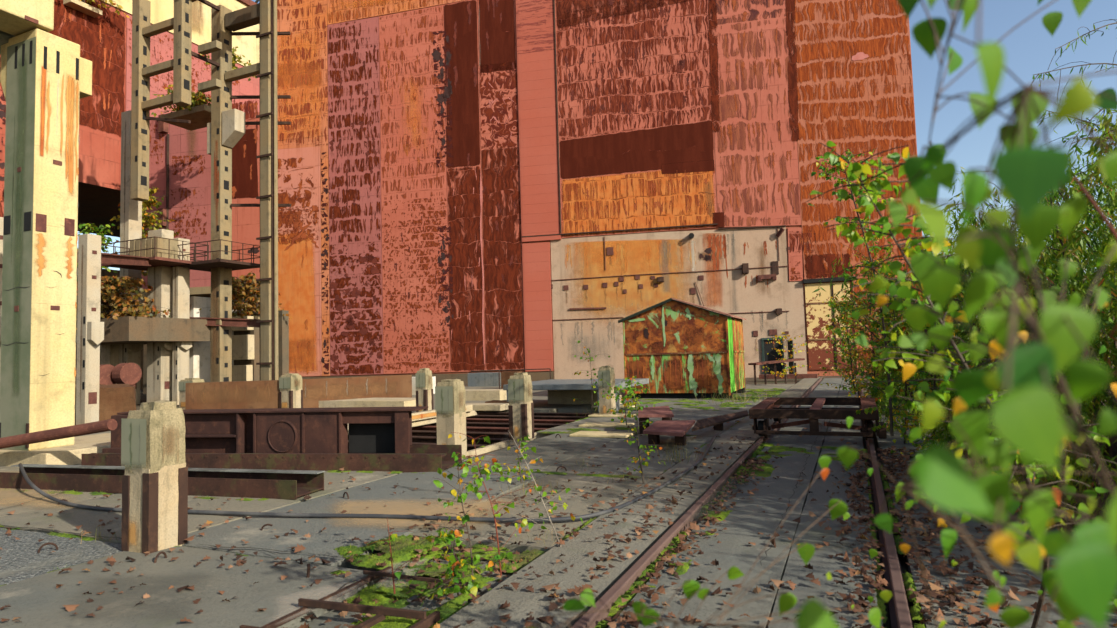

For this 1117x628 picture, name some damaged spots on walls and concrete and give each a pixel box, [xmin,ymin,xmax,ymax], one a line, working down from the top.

rust [40,0,125,194]
rust [556,0,728,390]
rust [744,241,777,288]
peeling [687,353,724,396]